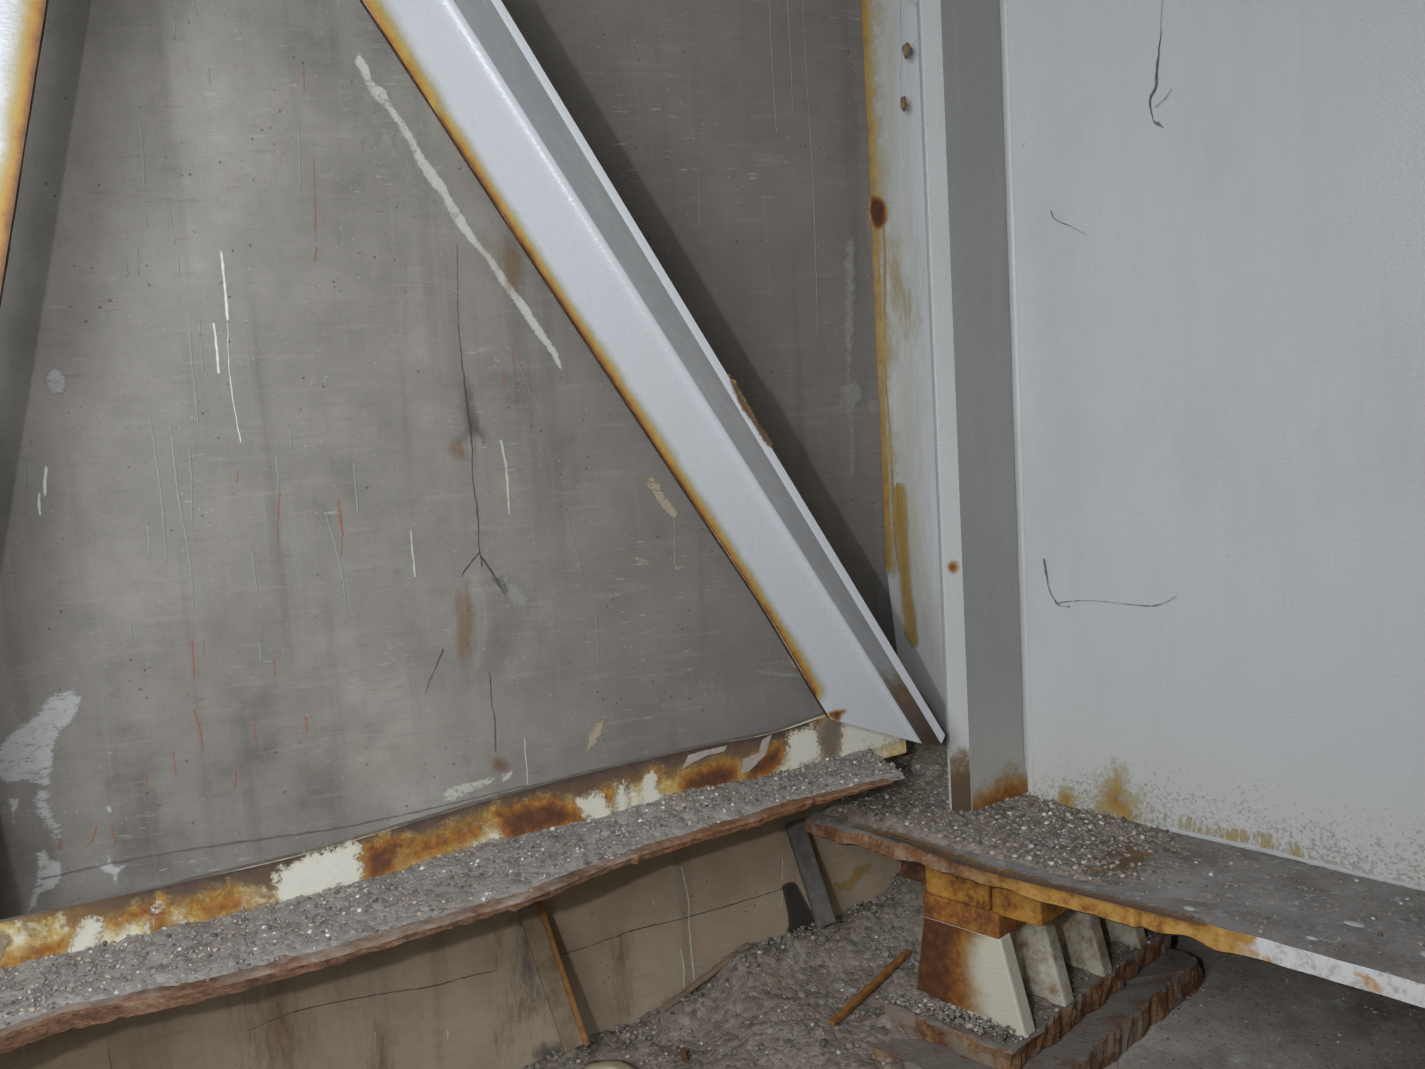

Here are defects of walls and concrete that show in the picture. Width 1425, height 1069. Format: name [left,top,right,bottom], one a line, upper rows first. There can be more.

corrosion [0,0,46,294]
corrosion [363,0,822,699]
corrosion [861,0,917,646]
crack [457,259,500,585]
crack [488,672,496,751]
peeling [27,850,64,912]
corrosion [0,710,844,969]
corrosion [830,819,1204,926]
corrosion [1057,768,1141,821]
corrosion [1179,818,1300,857]
corrosion [917,917,977,1013]